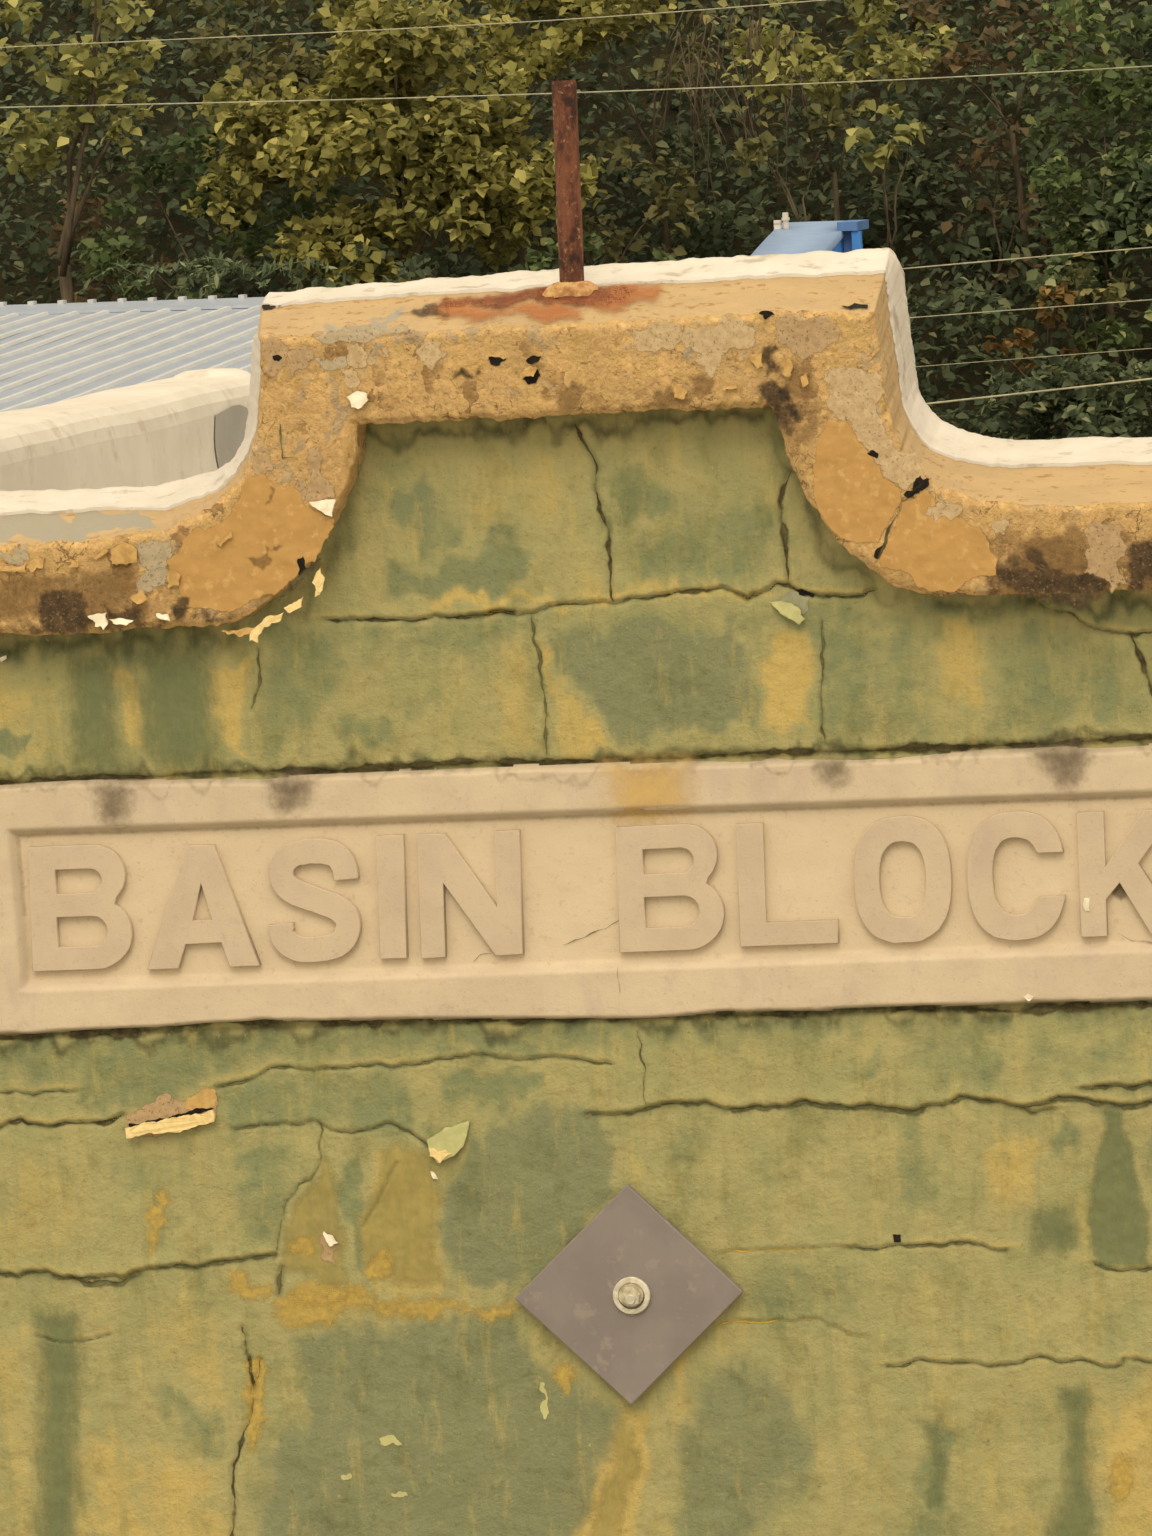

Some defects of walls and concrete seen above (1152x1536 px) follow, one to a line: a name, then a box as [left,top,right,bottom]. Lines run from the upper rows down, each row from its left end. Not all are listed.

corrosion [434,284,659,323]
spalling [262,324,408,409]
spalling [69,540,181,630]
crack [222,423,929,754]
spalling [1084,520,1128,592]
crack [0,1091,121,1127]
spalling [125,1088,218,1139]
peeling [427,1121,470,1179]
crack [538,1037,1152,1115]
damp [1035,1108,1147,1265]
crack [0,1221,282,1294]
damp [1056,1394,1092,1536]